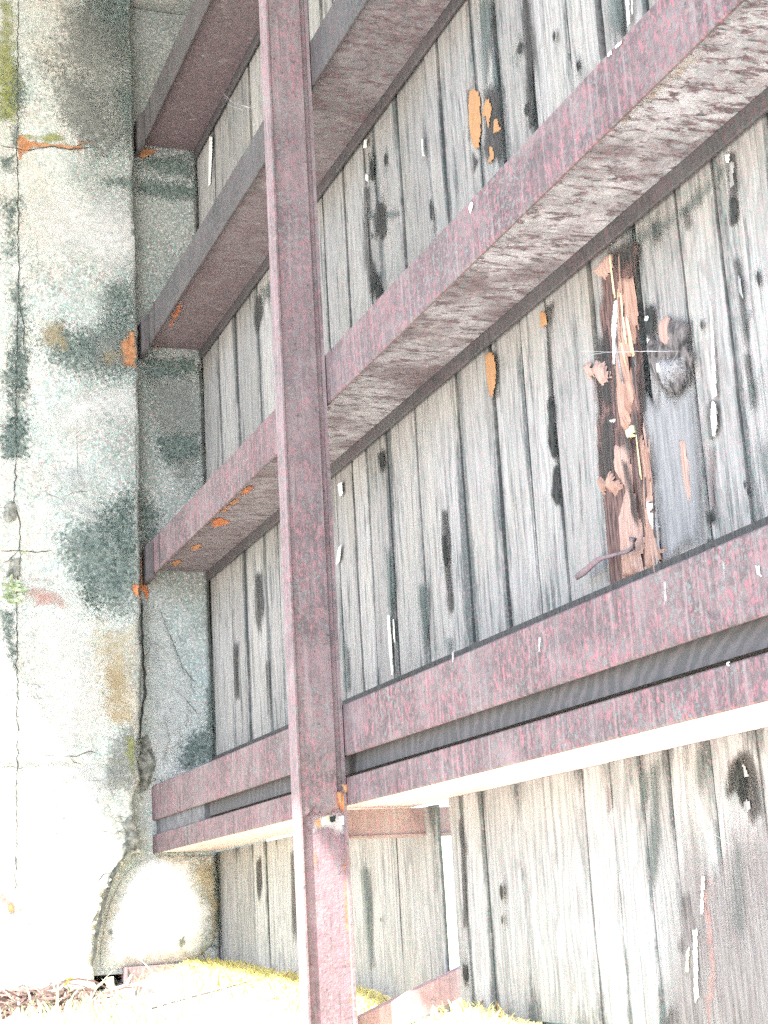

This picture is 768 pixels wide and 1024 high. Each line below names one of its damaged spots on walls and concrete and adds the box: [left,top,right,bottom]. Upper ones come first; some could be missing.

water stain [0,0,133,173]
corrosion [17,135,93,159]
peeling [467,85,501,171]
water stain [0,198,23,256]
corrosion [122,332,137,366]
peeling [485,352,498,396]
corrosion [213,486,252,527]
water stain [53,483,159,622]